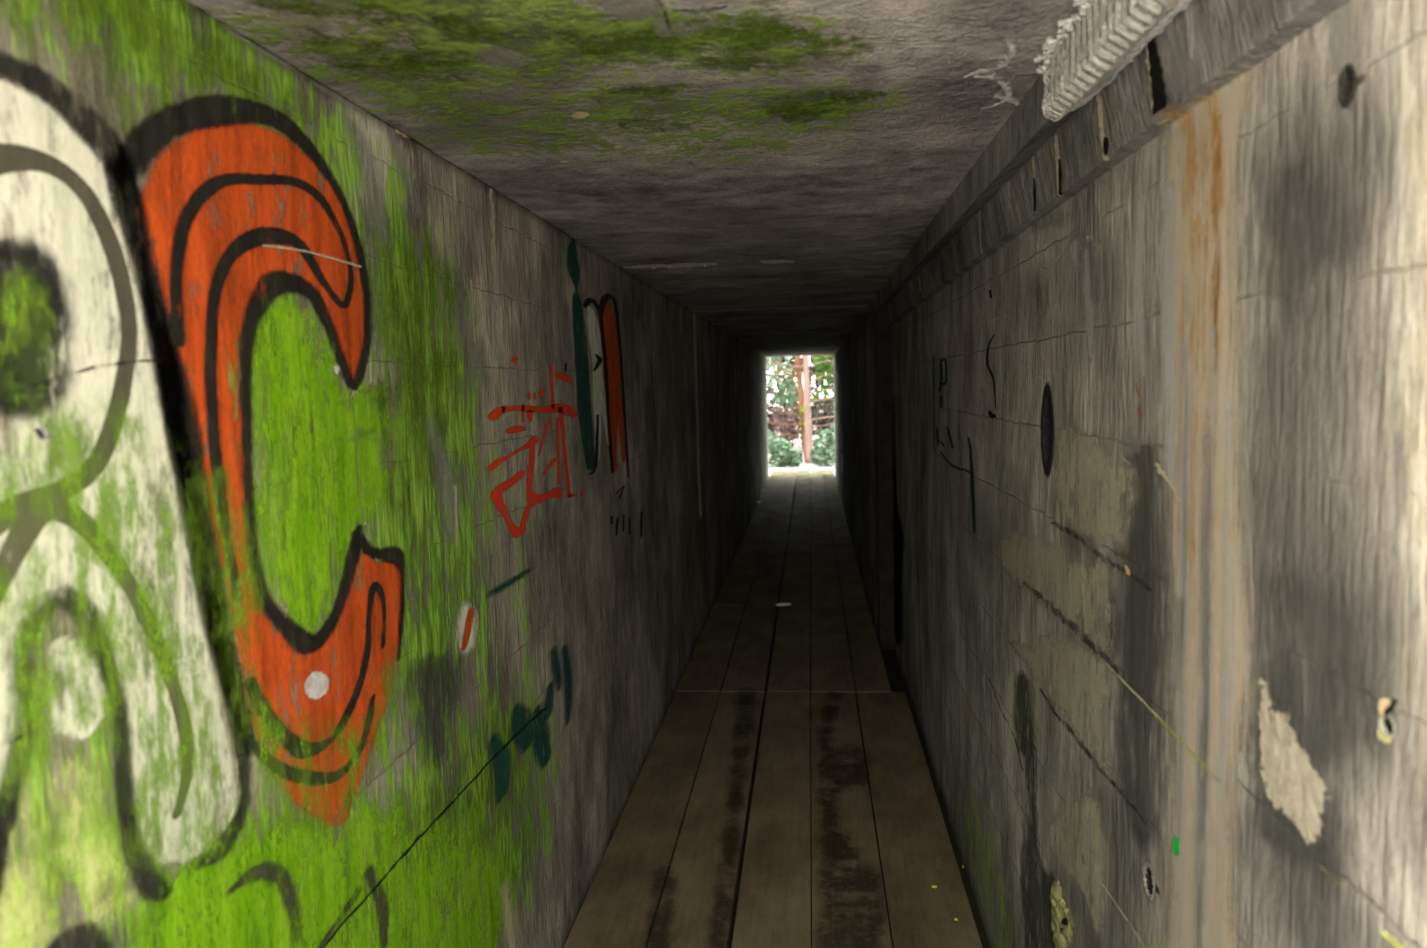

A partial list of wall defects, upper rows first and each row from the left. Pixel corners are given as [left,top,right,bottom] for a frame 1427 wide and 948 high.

water stain [963,41,1019,109]
water stain [1034,0,1194,122]
water stain [1110,67,1254,948]
water stain [417,658,453,763]
water stain [1014,673,1056,948]
peeling [1255,676,1332,845]
water stain [1255,728,1340,874]
water stain [1271,585,1363,764]